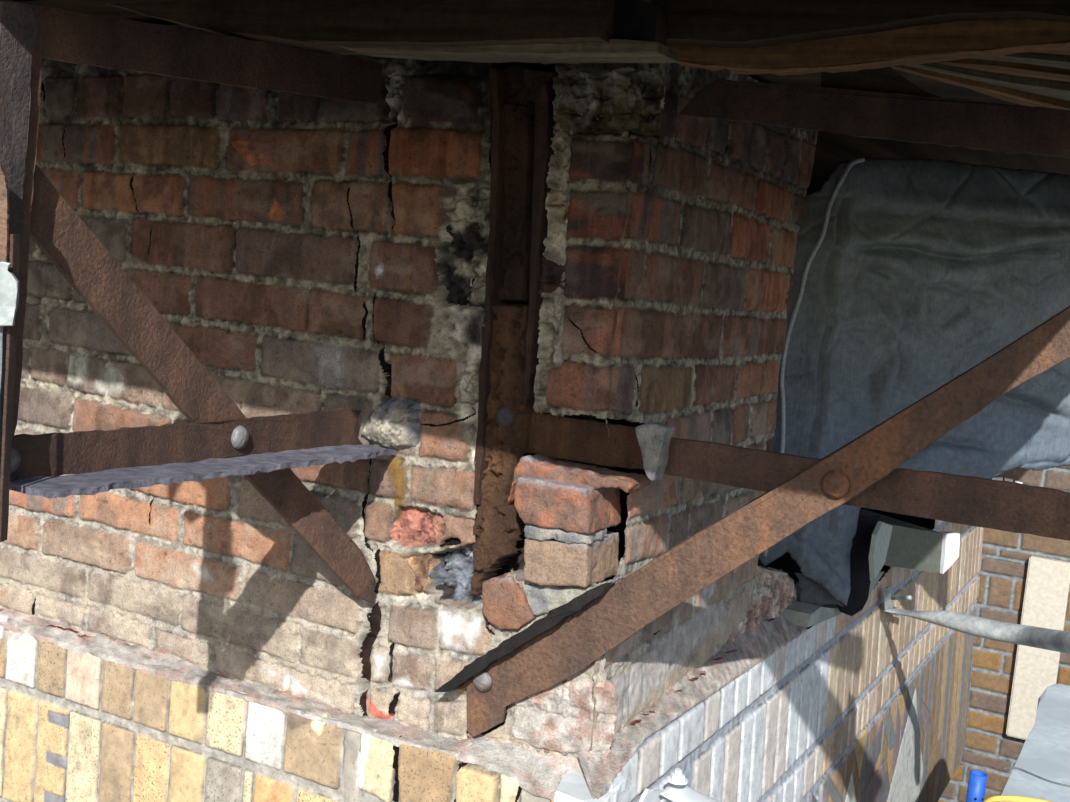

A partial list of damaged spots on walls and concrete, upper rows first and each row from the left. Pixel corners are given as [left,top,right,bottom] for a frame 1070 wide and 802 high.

crack [382,123,398,229]
crack [347,187,392,398]
spalling [389,507,624,630]
spalling [673,565,798,693]
spalling [511,678,656,755]
crack [515,774,527,802]